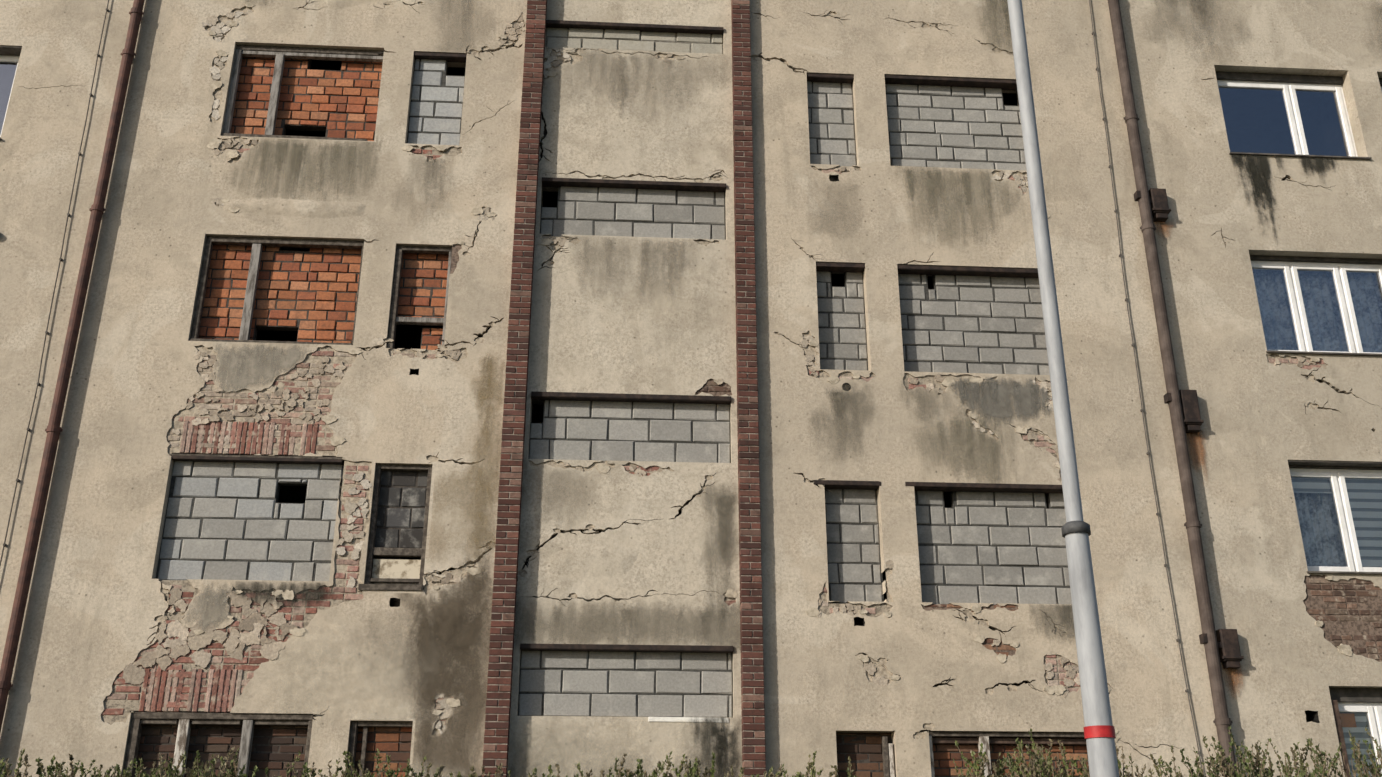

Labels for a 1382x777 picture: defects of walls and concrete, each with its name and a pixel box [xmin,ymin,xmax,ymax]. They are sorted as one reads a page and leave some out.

flaking render [201,2,259,165]
water stain [1231,154,1280,234]
water stain [1301,157,1333,172]
crack [1305,374,1351,410]
flaking render [101,345,372,725]
crack [419,475,713,606]
water stain [401,575,491,777]
flaking render [973,634,1019,663]
flaking render [1043,655,1081,698]
flaking render [1303,574,1382,662]
water stain [512,742,625,777]
water stain [683,716,738,777]